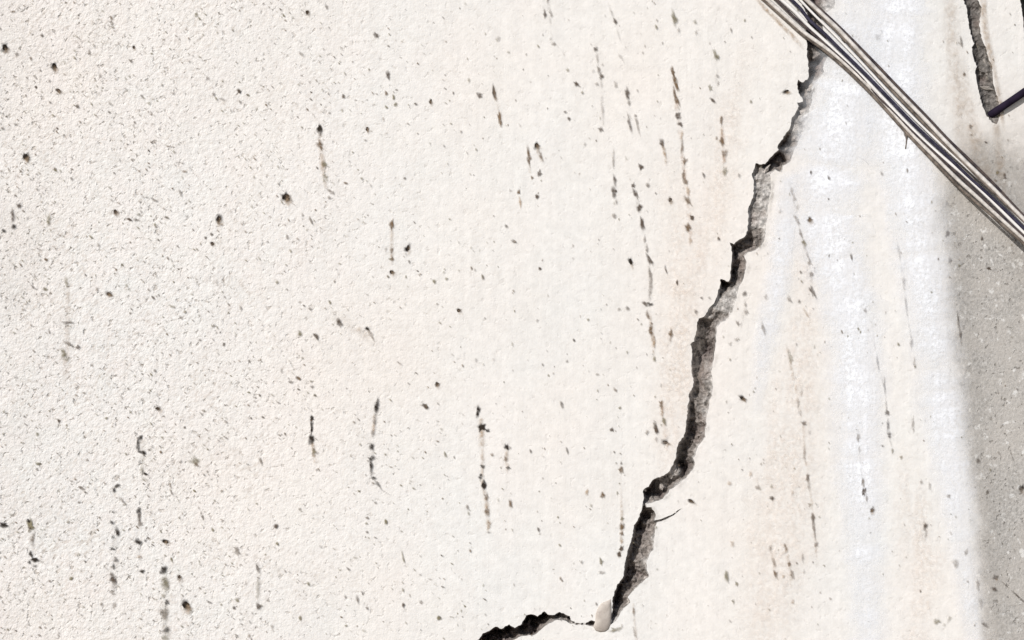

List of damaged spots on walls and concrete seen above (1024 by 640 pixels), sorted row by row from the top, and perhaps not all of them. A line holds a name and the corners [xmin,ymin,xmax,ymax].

crack [478,0,835,640]
crack [964,0,1000,124]